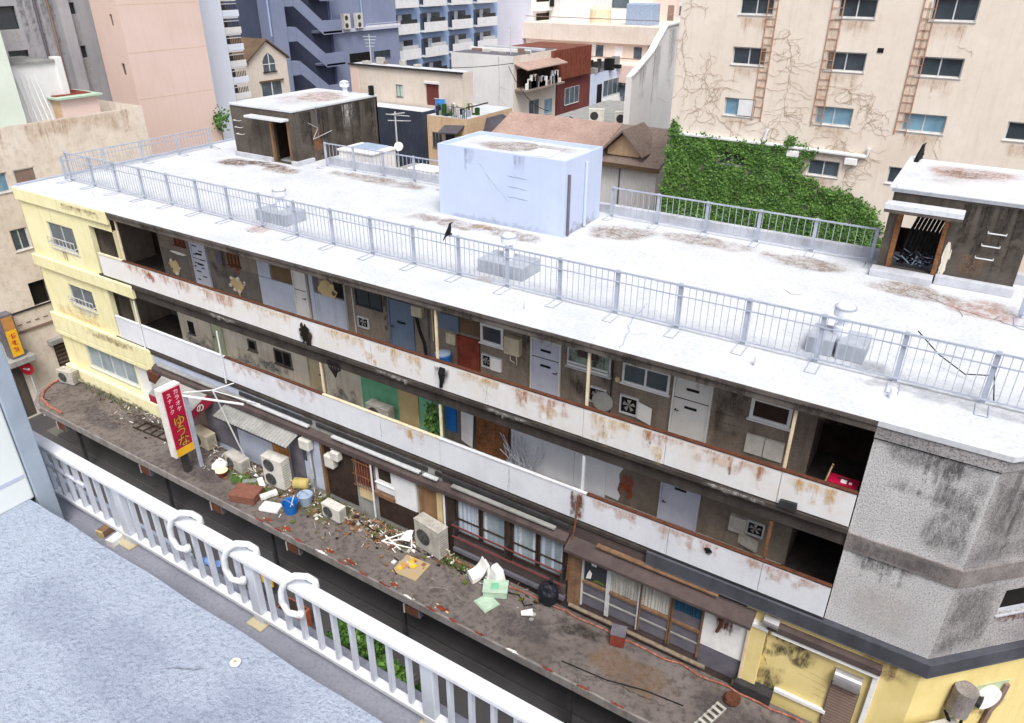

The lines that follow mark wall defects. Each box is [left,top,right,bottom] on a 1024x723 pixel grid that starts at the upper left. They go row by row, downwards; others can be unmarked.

rust [476,417,510,462]
damp [895,447,984,549]
damp [767,637,809,667]